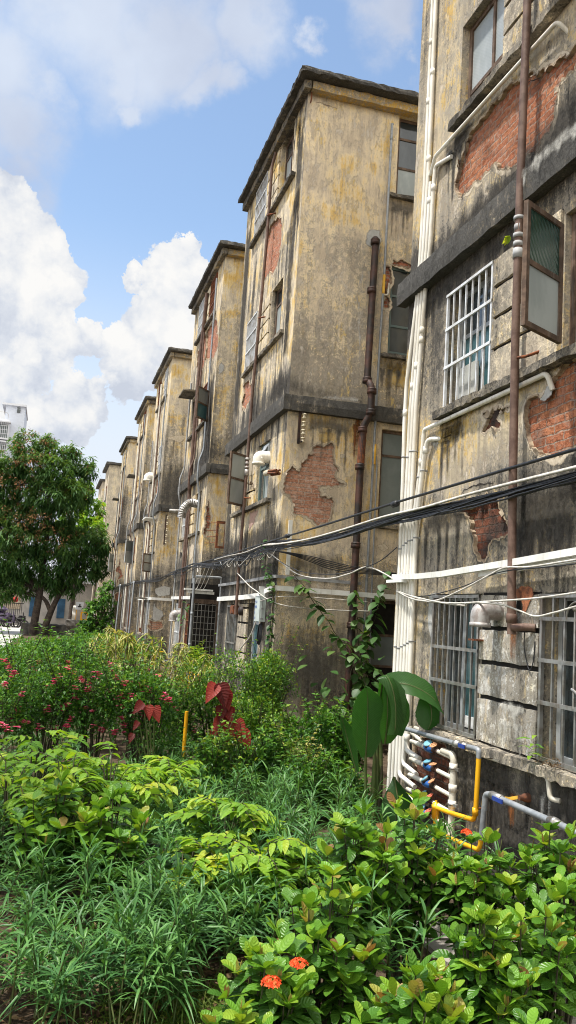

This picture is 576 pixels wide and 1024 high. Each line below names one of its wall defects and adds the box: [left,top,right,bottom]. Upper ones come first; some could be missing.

flaking render [453,40,576,200]
flaking render [261,214,283,283]
damp [283,119,305,358]
flaking render [382,258,411,311]
flaking render [480,358,576,466]
damp [164,469,180,505]
flaking render [280,432,347,528]
damp [424,509,462,579]
flaking render [457,491,508,564]